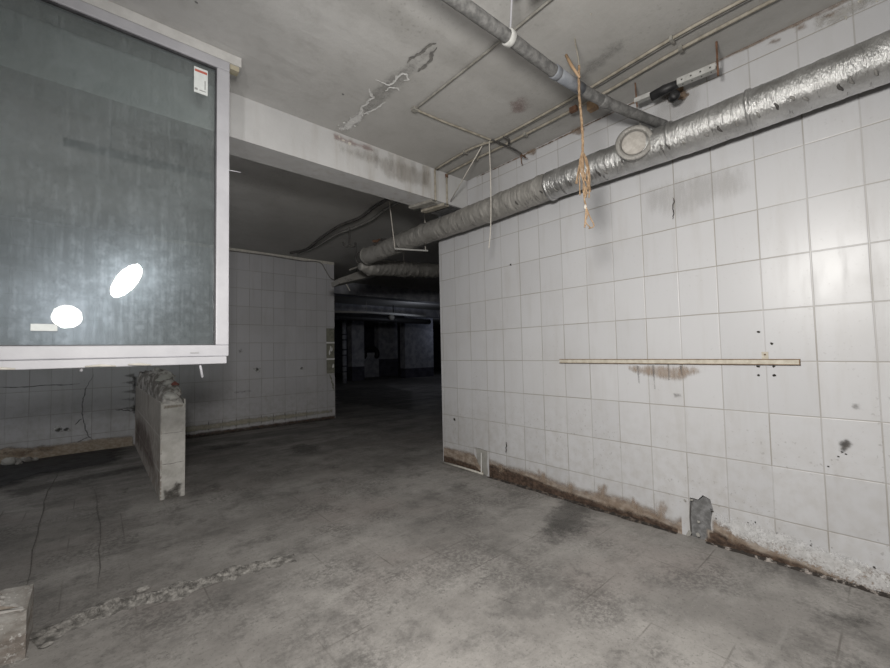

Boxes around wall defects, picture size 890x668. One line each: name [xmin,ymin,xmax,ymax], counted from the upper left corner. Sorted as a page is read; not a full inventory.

crack [338,43,437,130]
crack [3,375,94,442]
peeling [684,496,890,593]